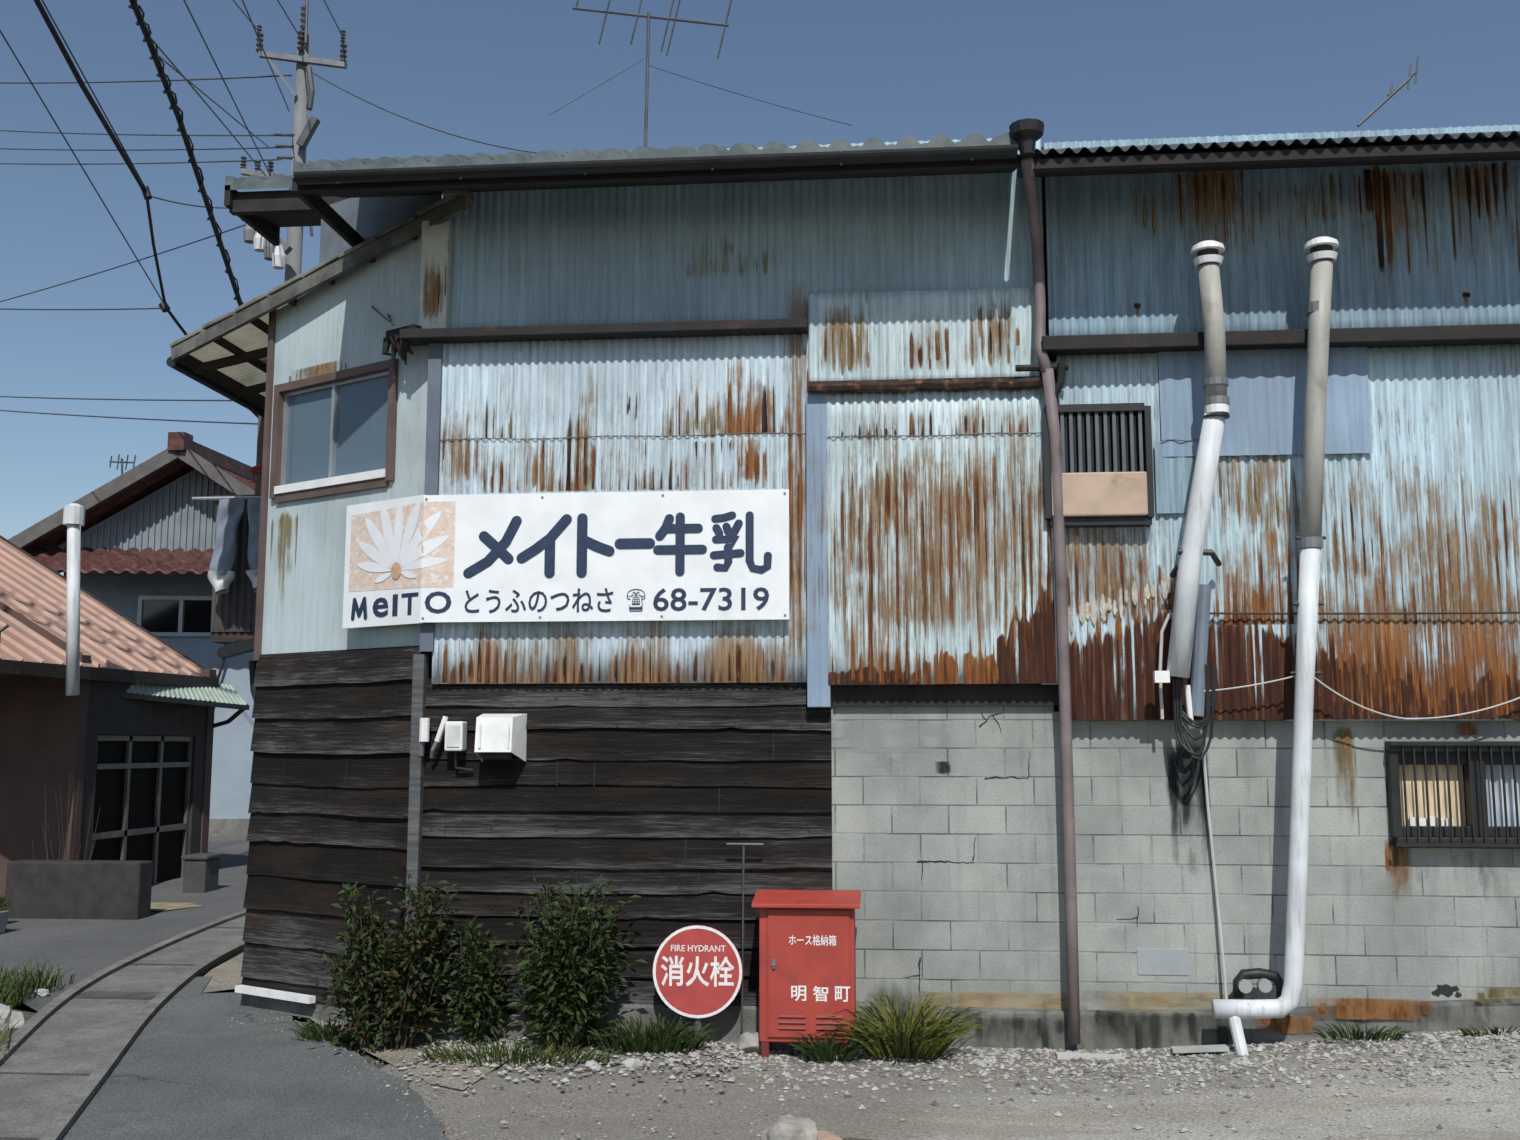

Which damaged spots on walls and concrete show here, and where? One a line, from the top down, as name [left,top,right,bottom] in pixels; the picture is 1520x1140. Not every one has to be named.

rust [1134,162,1520,274]
rust [423,266,446,319]
rust [437,287,1299,720]
rust [271,514,298,591]
rust [1313,470,1520,798]
leakage [1168,746,1206,831]
rust [1385,840,1409,890]